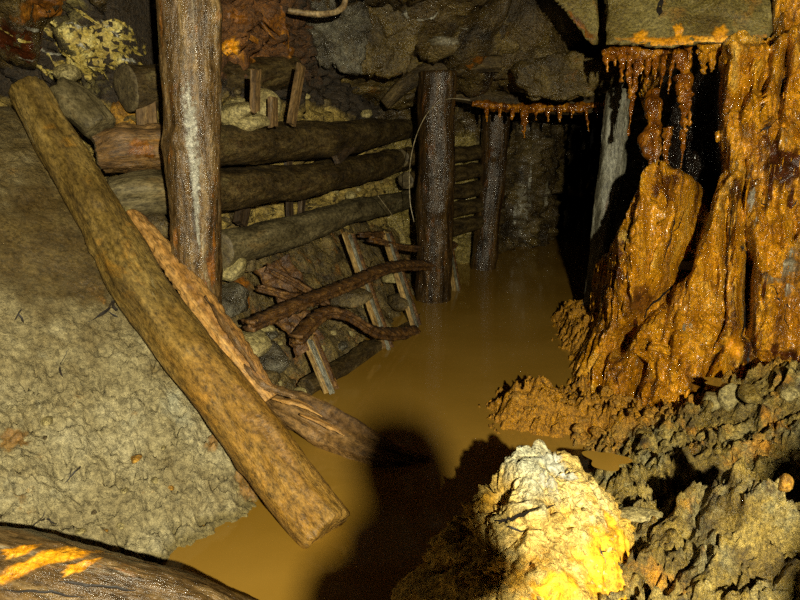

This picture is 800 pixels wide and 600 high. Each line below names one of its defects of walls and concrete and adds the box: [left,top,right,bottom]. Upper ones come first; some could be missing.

efflorescence [182,81,200,245]
rust [471,100,605,139]
rust [601,24,729,168]